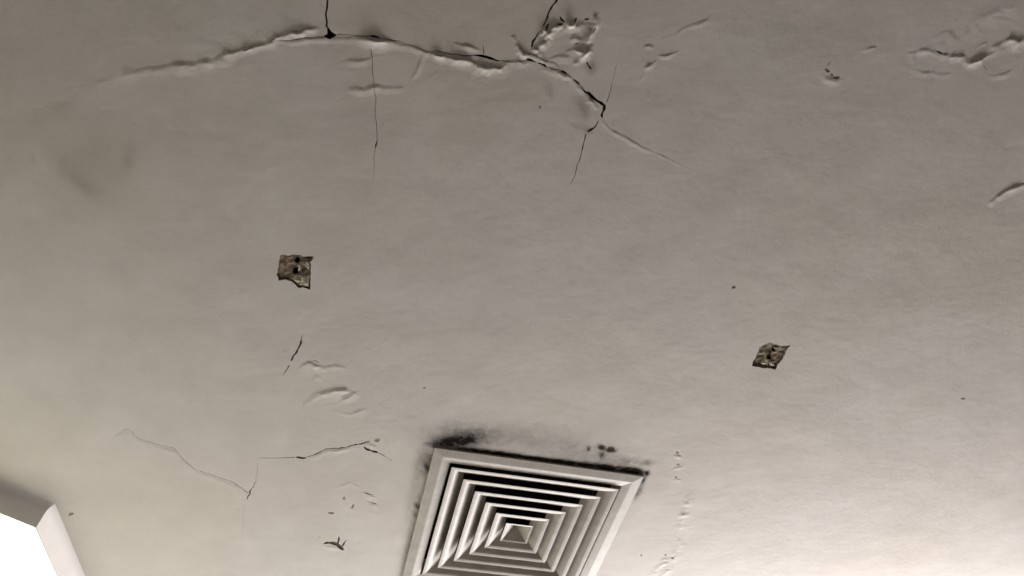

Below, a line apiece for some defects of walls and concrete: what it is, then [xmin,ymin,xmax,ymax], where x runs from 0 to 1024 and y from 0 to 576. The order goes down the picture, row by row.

peeling [529,12,602,70]
crack [48,0,692,184]
crack [274,335,303,375]
crack [285,438,392,461]
damp [438,433,649,483]